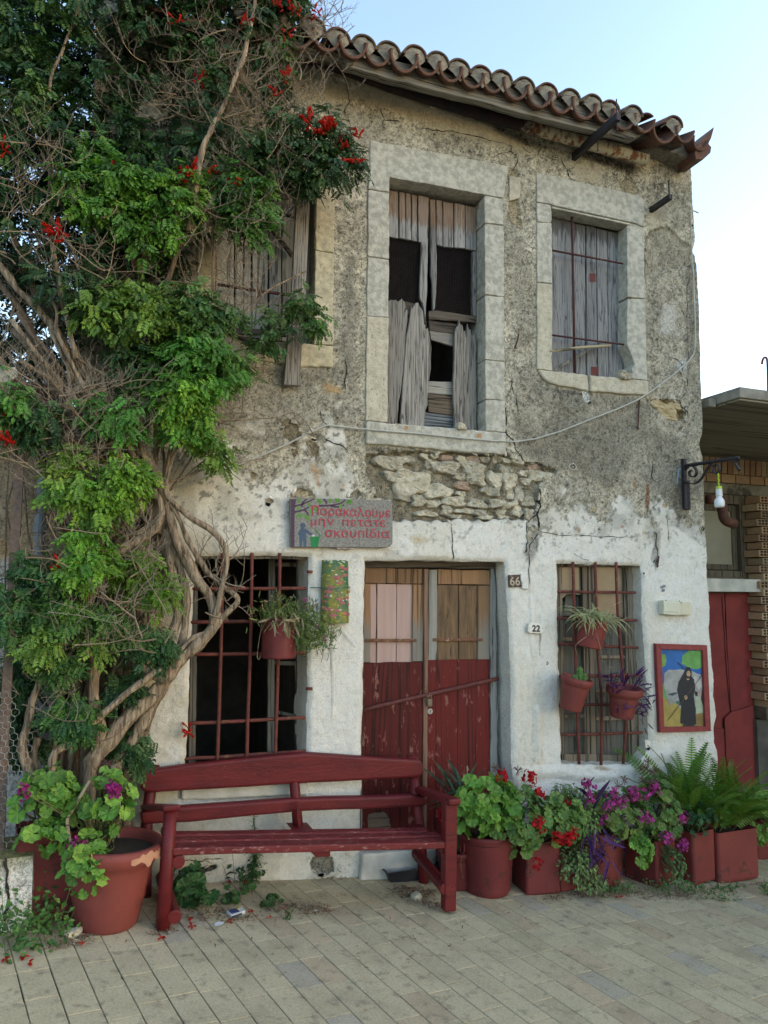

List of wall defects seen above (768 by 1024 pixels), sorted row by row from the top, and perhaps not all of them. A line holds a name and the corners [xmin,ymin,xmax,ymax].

crack [494,374,670,582]
flaking render [646,397,685,422]